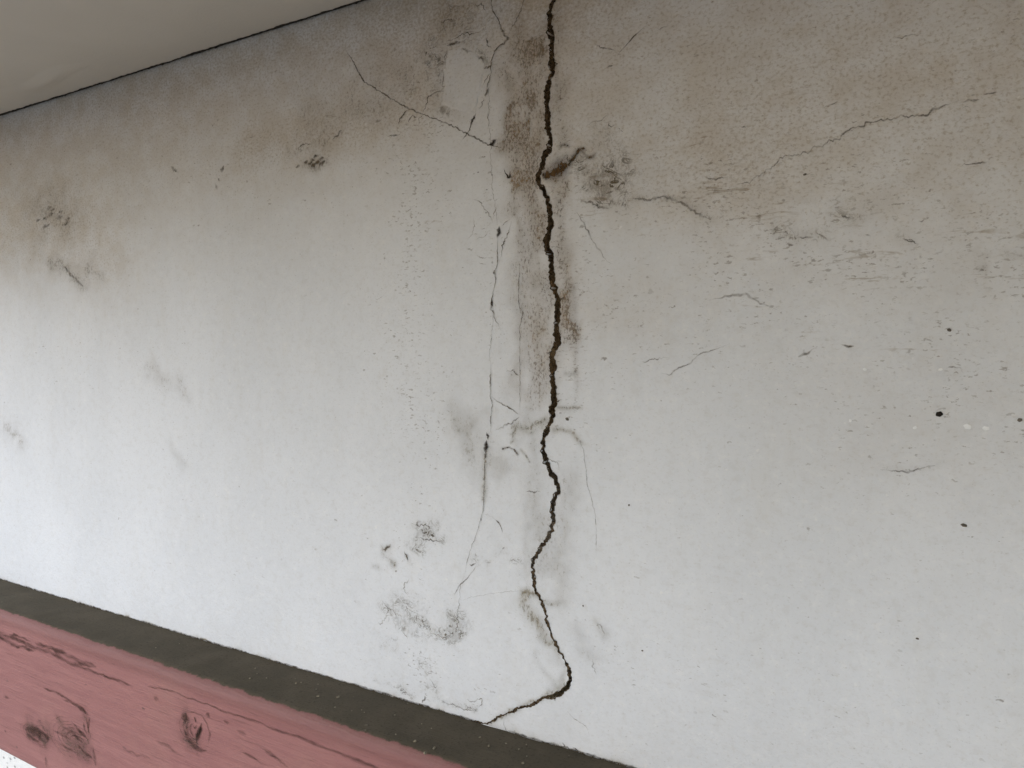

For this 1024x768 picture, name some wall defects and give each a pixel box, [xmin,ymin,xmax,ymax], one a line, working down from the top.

crack [351,0,524,148]
crack [469,0,572,729]
leakage [497,25,581,402]